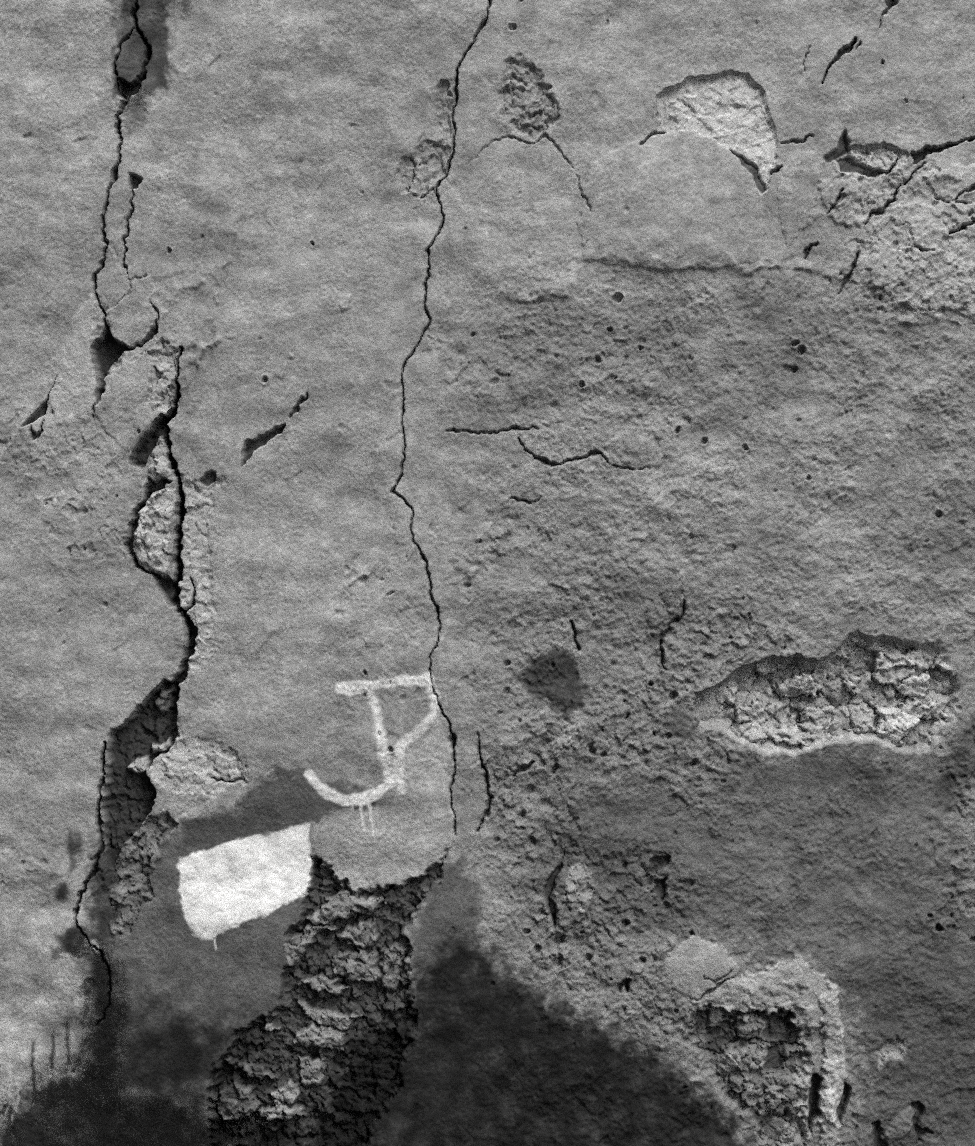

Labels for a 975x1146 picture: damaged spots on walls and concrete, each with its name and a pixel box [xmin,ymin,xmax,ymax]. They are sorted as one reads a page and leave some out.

crack [803,0,899,84]
flaking render [639,71,813,193]
flaking render [824,131,911,181]
crack [91,13,198,686]
crack [390,0,535,835]
crack [446,426,635,470]
spalling [73,471,250,993]
spalling [693,631,964,758]
crack [648,855,670,902]
crack [618,979,630,994]
peeling [664,933,850,1146]
peeling [856,1101,933,1146]